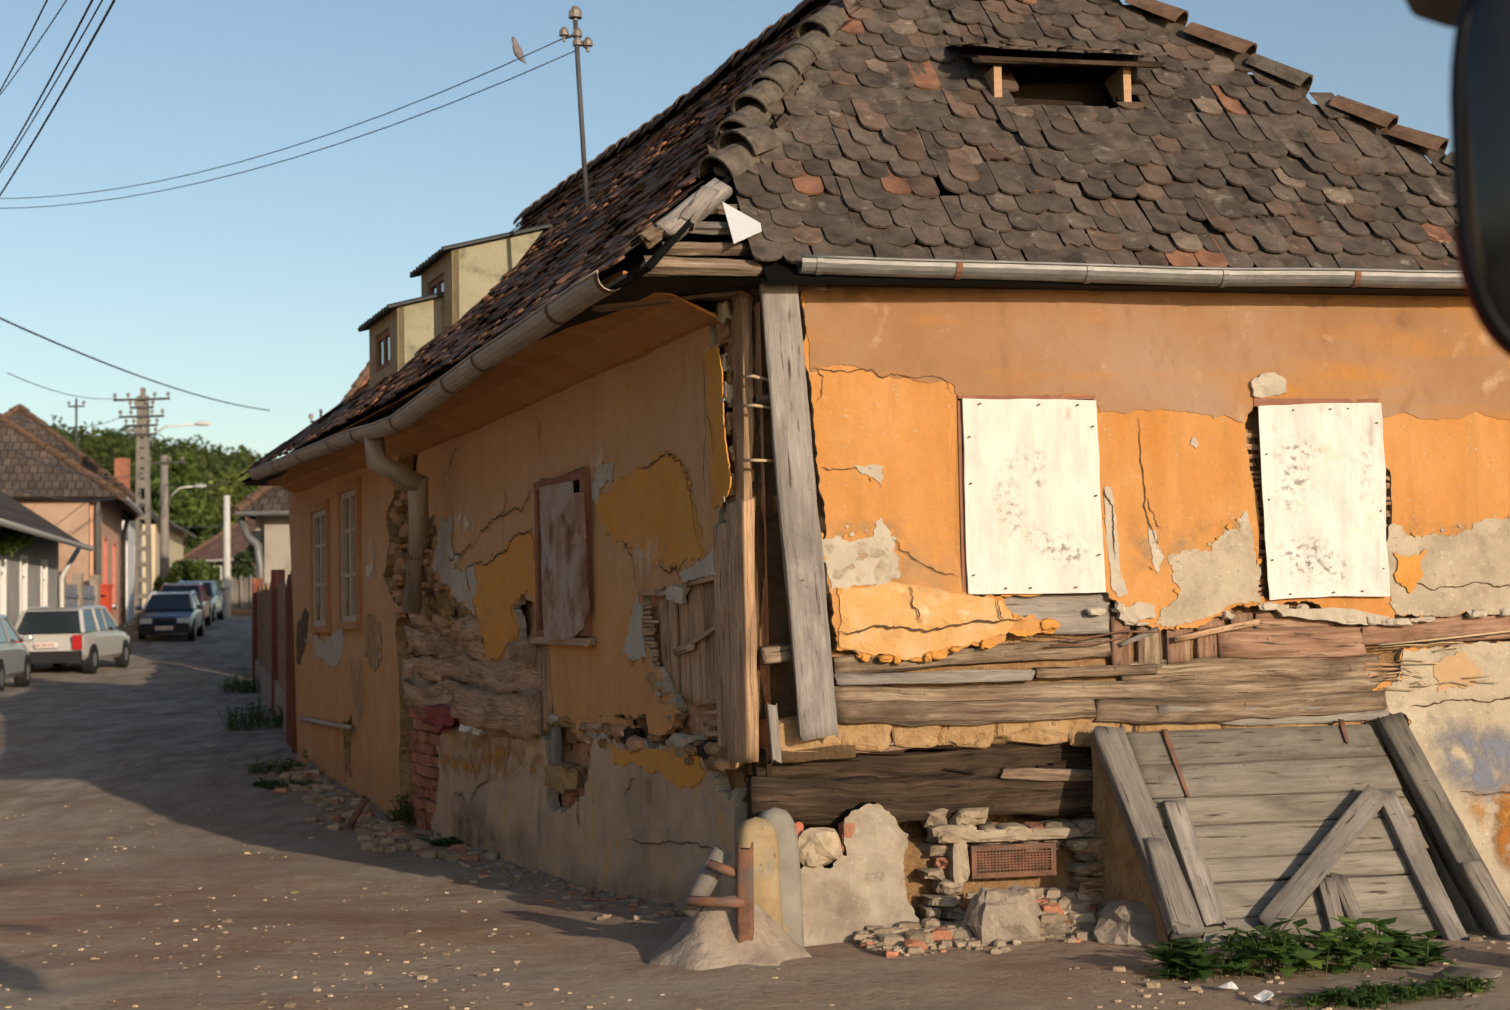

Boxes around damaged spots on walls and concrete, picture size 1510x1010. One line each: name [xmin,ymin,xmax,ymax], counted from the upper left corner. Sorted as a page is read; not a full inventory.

peeling [364,482,535,672]
crack [447,485,533,569]
flaking render [439,451,754,808]
crack [1103,418,1165,556]
peeling [821,429,1510,906]
crack [1417,582,1510,590]